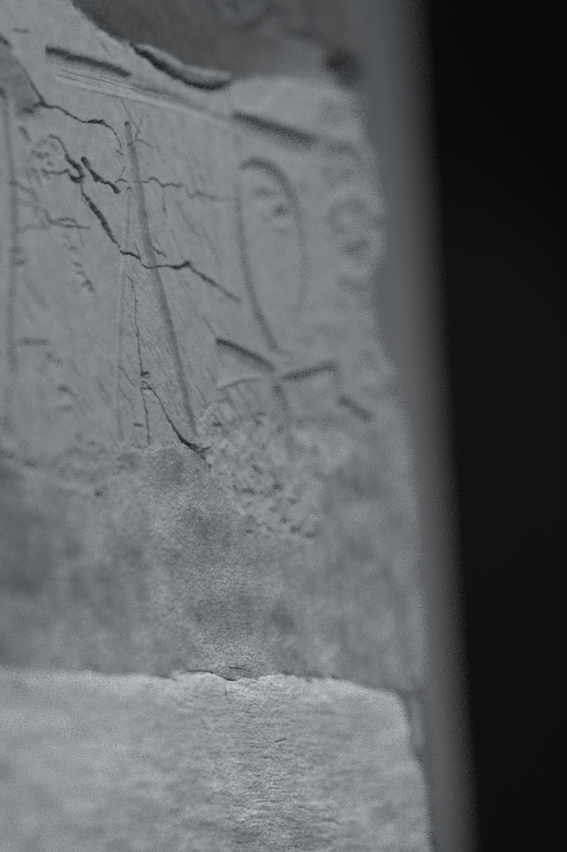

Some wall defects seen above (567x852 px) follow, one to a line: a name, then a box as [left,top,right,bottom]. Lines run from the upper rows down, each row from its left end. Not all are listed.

crack [9,69,242,470]
spalling [190,398,354,542]